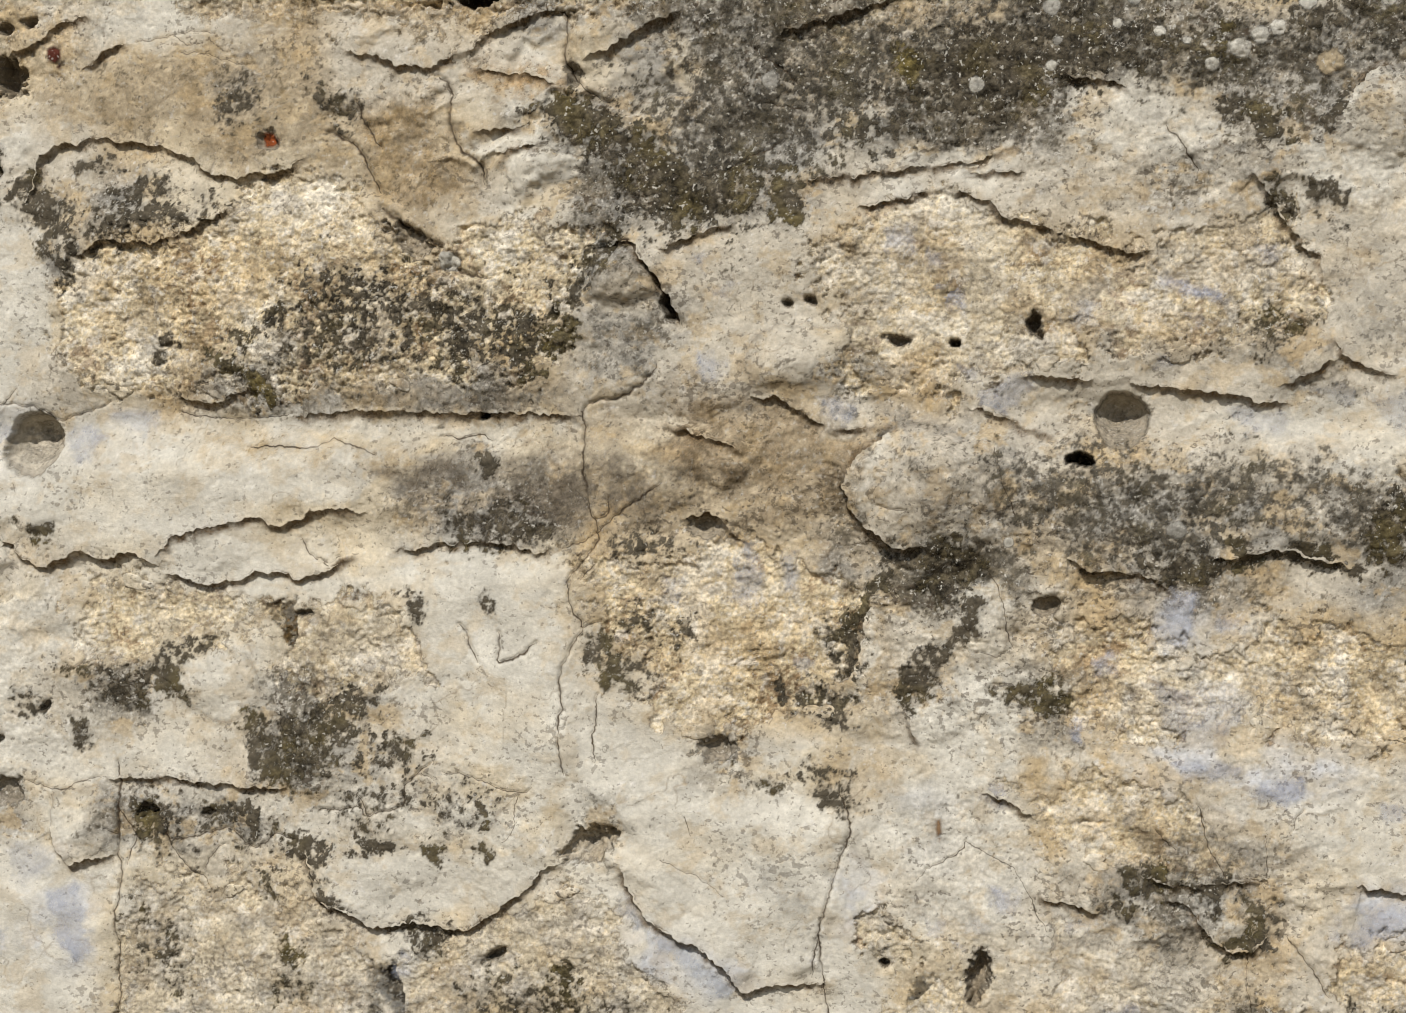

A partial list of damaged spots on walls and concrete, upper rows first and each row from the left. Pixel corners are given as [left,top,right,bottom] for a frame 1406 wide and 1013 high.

leakage [1256,0,1406,48]
leakage [531,90,622,144]
leakage [751,5,1296,158]
leakage [767,161,806,231]
leakage [1264,163,1351,231]
crack [607,238,680,322]
leakage [1238,300,1325,363]
crack [0,389,108,420]
spalling [0,497,440,710]
crack [557,365,662,774]
spalling [115,848,826,1013]
crack [812,793,851,1013]